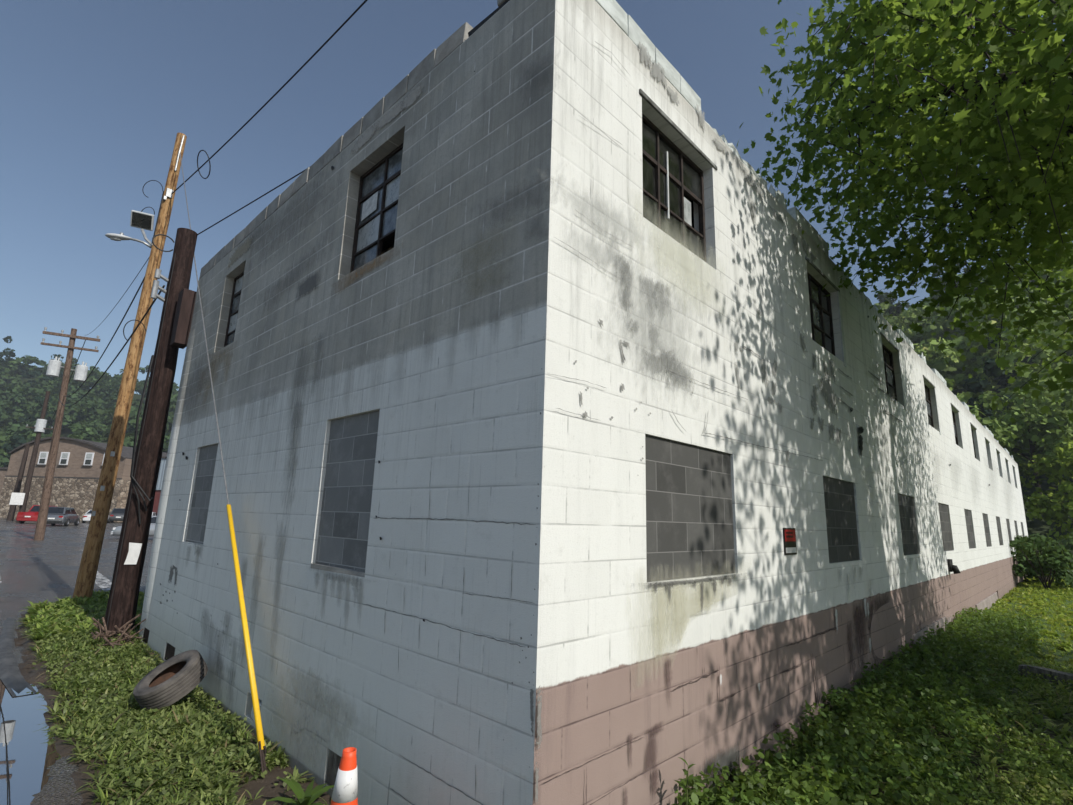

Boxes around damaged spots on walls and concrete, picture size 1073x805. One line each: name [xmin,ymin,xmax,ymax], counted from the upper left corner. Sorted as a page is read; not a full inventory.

water stain [298,273,317,297]
water stain [616,256,691,387]
peeling [734,341,782,413]
peeling [799,332,841,443]
water stain [649,575,733,605]
water stain [646,724,661,792]